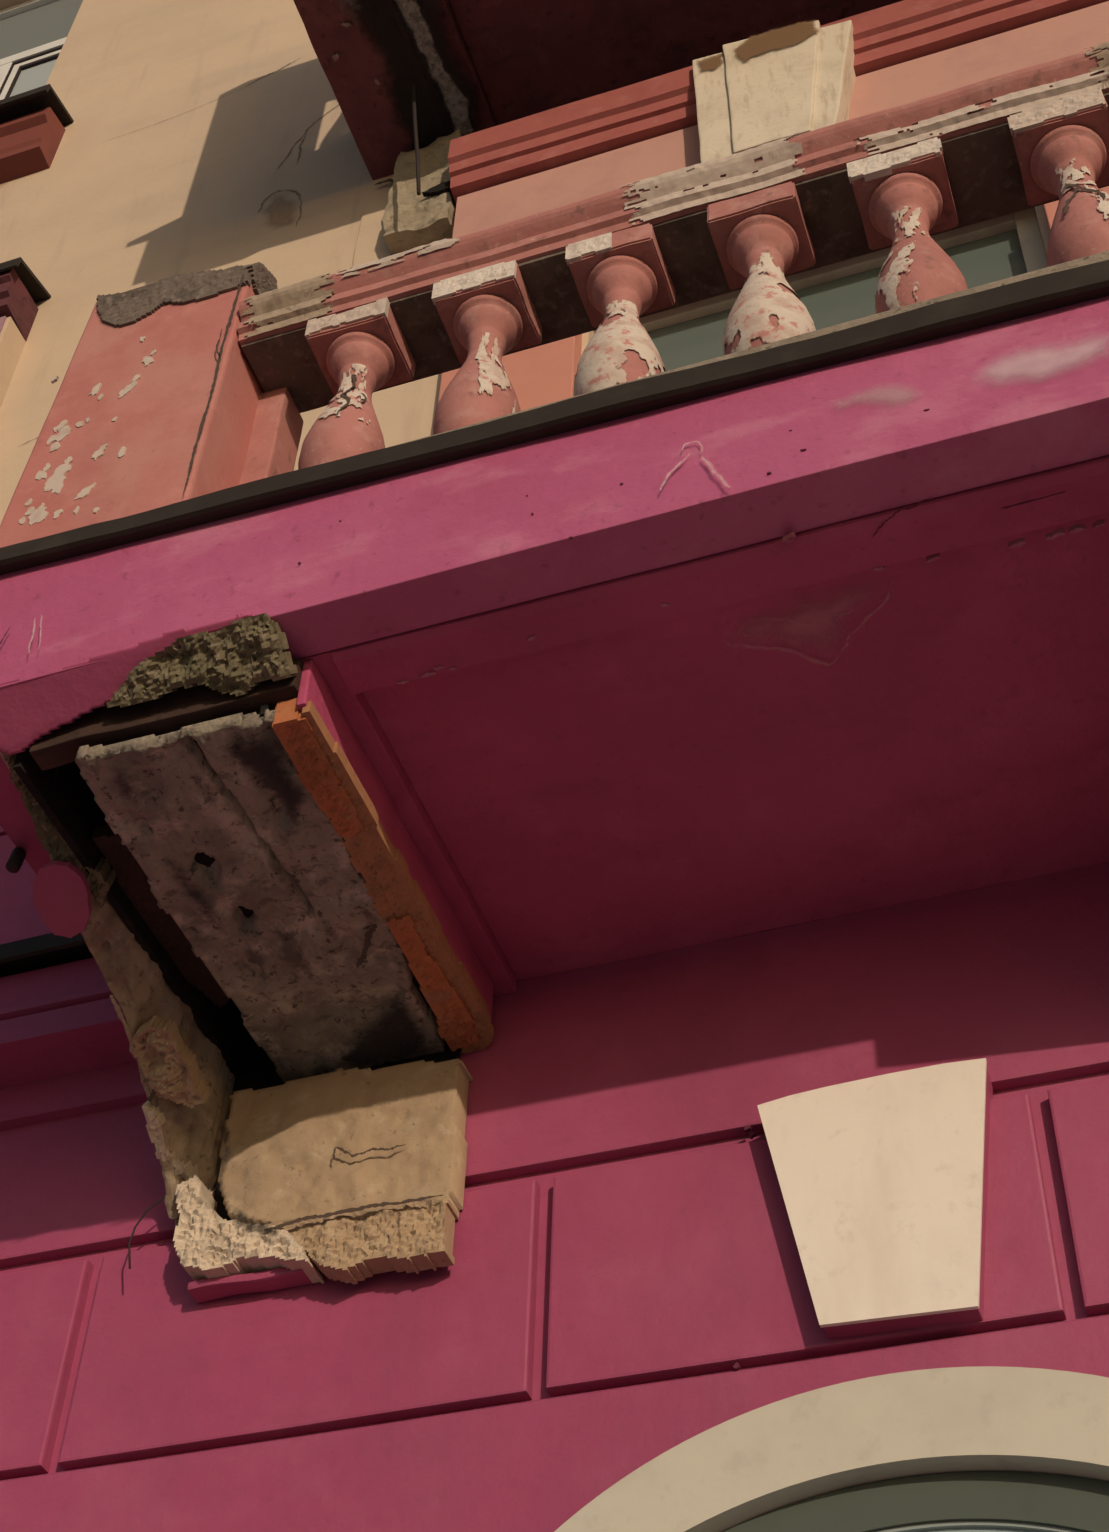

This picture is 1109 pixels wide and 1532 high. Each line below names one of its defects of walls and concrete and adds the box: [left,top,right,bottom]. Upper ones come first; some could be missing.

water stain [347,0,481,149]
crack [278,104,339,168]
peeling [622,133,806,225]
spalling [88,237,460,425]
peeling [431,260,517,305]
peeling [470,332,516,413]
peeling [565,232,612,265]
peeling [573,300,665,396]
peeling [723,253,816,356]
peeling [873,206,925,313]
spalling [0,613,494,1303]
crack [264,1195,443,1231]